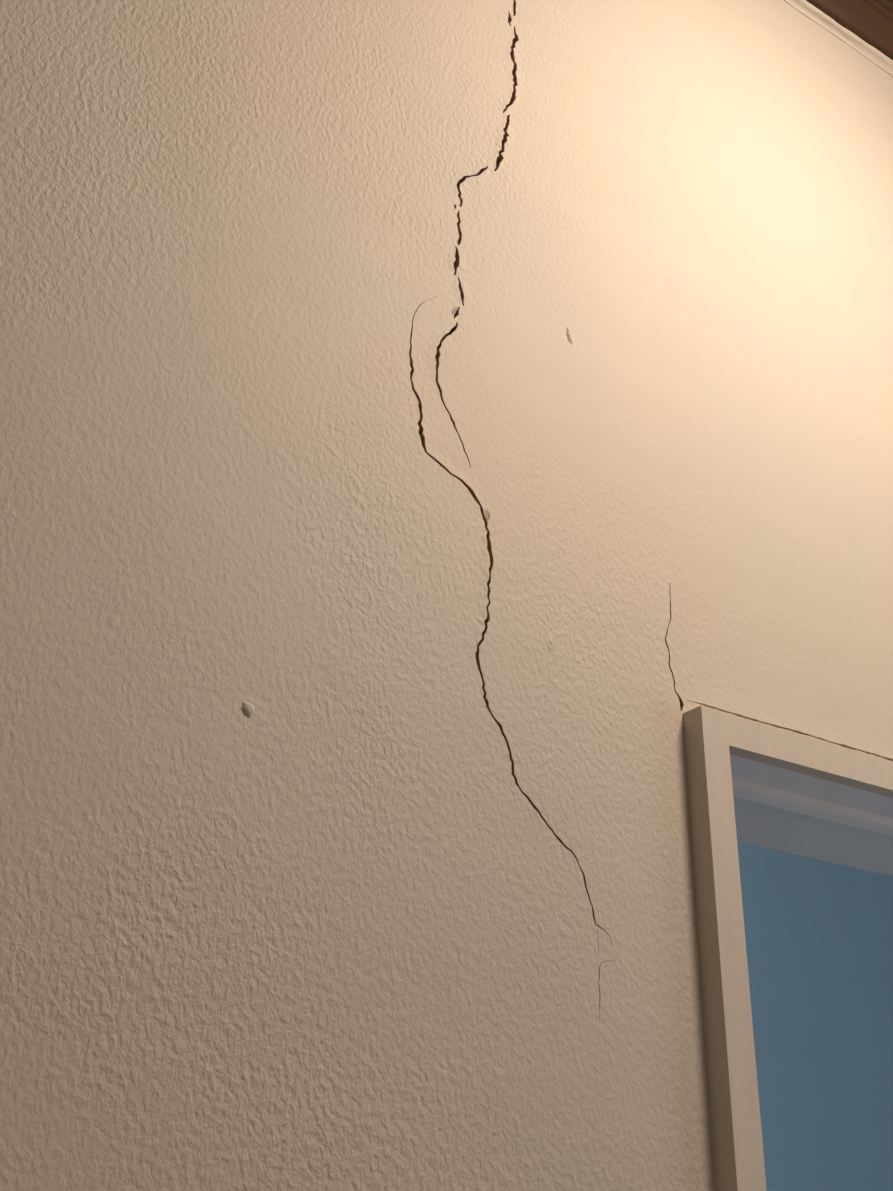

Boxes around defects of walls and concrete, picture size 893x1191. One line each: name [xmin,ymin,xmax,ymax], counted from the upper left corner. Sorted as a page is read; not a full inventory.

crack [409,0,617,1018]